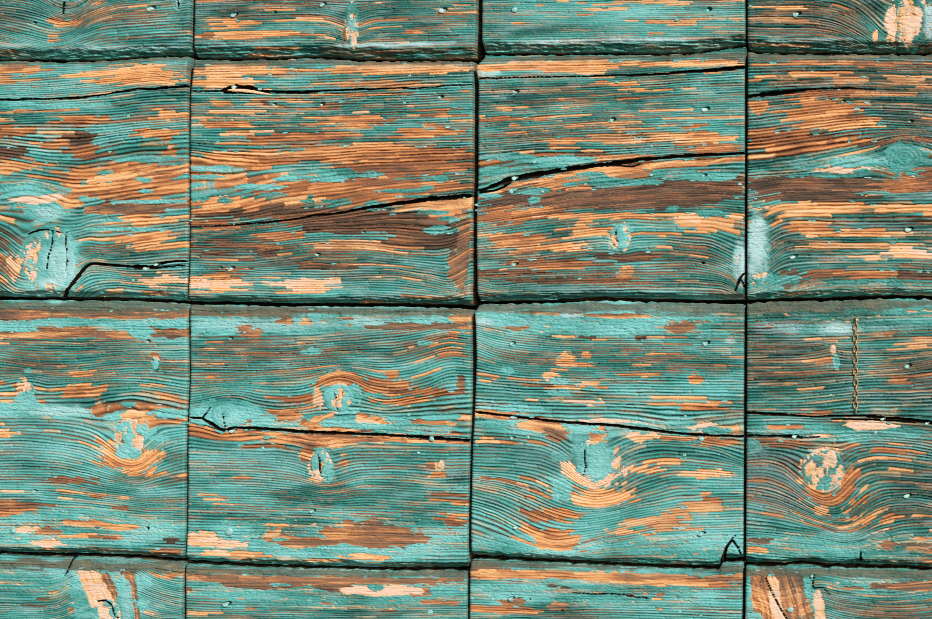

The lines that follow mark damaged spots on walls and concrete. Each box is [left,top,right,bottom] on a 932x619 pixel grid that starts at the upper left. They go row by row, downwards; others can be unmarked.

peeling [195,19,326,40]
peeling [873,0,923,49]
peeling [0,59,932,296]
crack [191,152,745,228]
crack [28,229,188,299]
peeling [0,307,210,340]
peeling [51,369,517,482]
crack [189,393,470,473]
crack [476,411,932,438]
peeling [475,396,739,552]
peeling [78,562,120,619]
peeling [148,566,932,619]